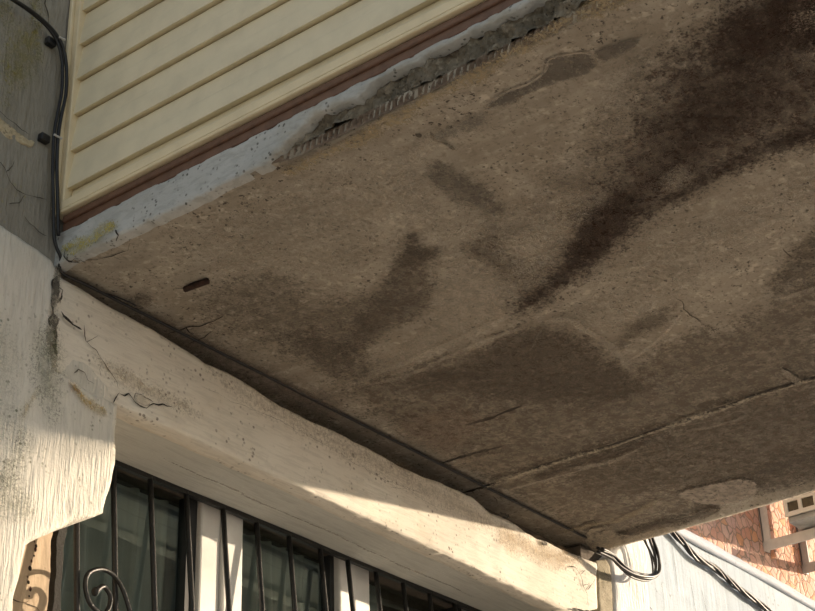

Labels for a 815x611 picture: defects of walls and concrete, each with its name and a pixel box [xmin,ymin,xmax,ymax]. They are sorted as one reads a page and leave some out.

spalling [0,112,34,147]
spalling [272,0,618,164]
crack [0,162,46,236]
crack [47,230,172,408]
damp [202,0,815,551]
crack [462,376,815,500]
crack [569,566,596,611]